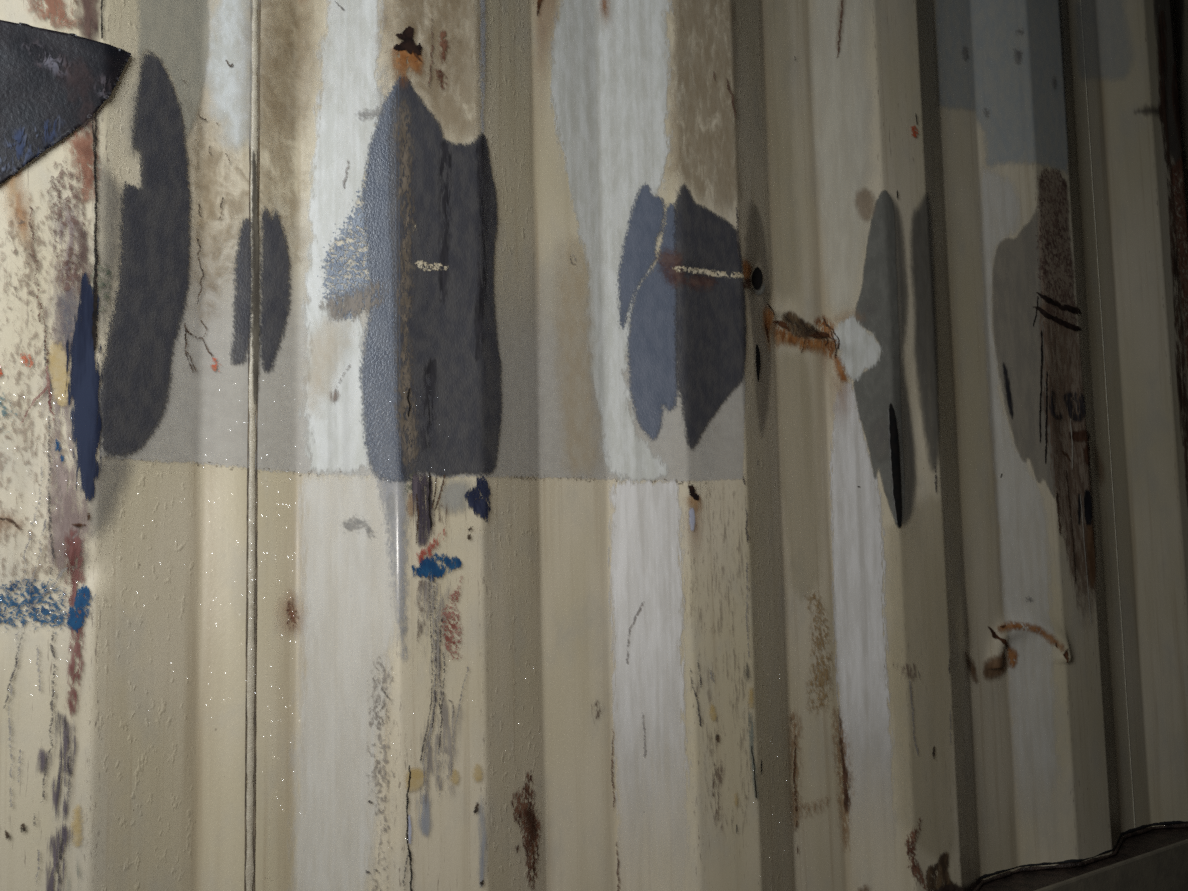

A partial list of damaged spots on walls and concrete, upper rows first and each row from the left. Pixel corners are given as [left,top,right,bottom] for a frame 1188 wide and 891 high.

rust [764,304,846,381]
rust [966,622,1069,681]
rust [512,773,541,889]